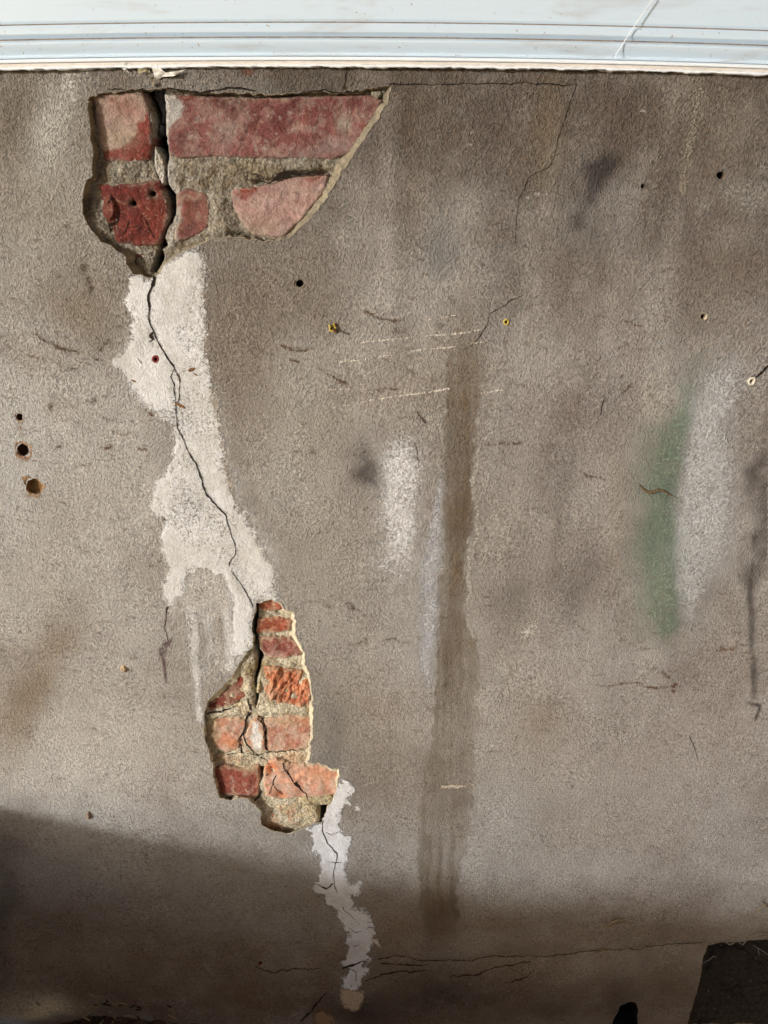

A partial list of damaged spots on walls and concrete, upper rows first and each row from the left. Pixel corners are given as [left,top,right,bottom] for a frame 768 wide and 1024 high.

spalling [82,62,392,279]
crack [389,70,577,243]
crack [147,276,254,607]
leakage [421,370,480,686]
spalling [203,599,340,834]
crack [255,809,707,1022]